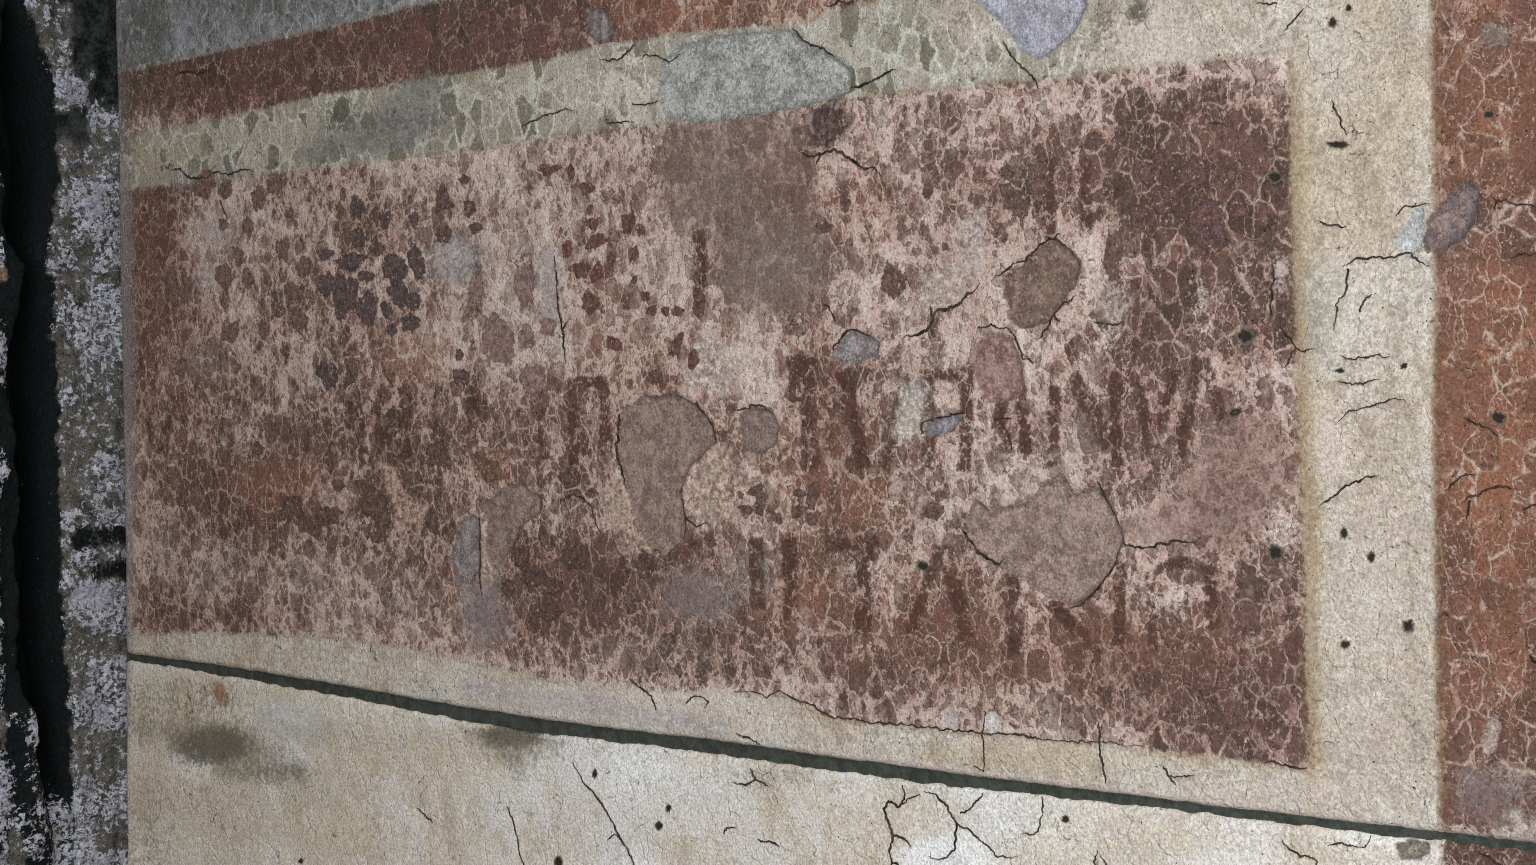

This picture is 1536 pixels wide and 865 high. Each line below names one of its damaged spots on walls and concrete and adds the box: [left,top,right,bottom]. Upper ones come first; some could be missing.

peeling [657,29,854,124]
peeling [558,213,820,579]
crack [798,148,882,176]
peeling [881,154,1050,322]
peeling [974,240,1081,404]
peeling [1102,230,1128,321]
crack [1269,203,1430,422]
peeling [1395,181,1480,260]
peeling [473,450,590,621]
spalling [966,474,1124,605]
crack [572,762,635,865]
crack [632,681,1193,865]